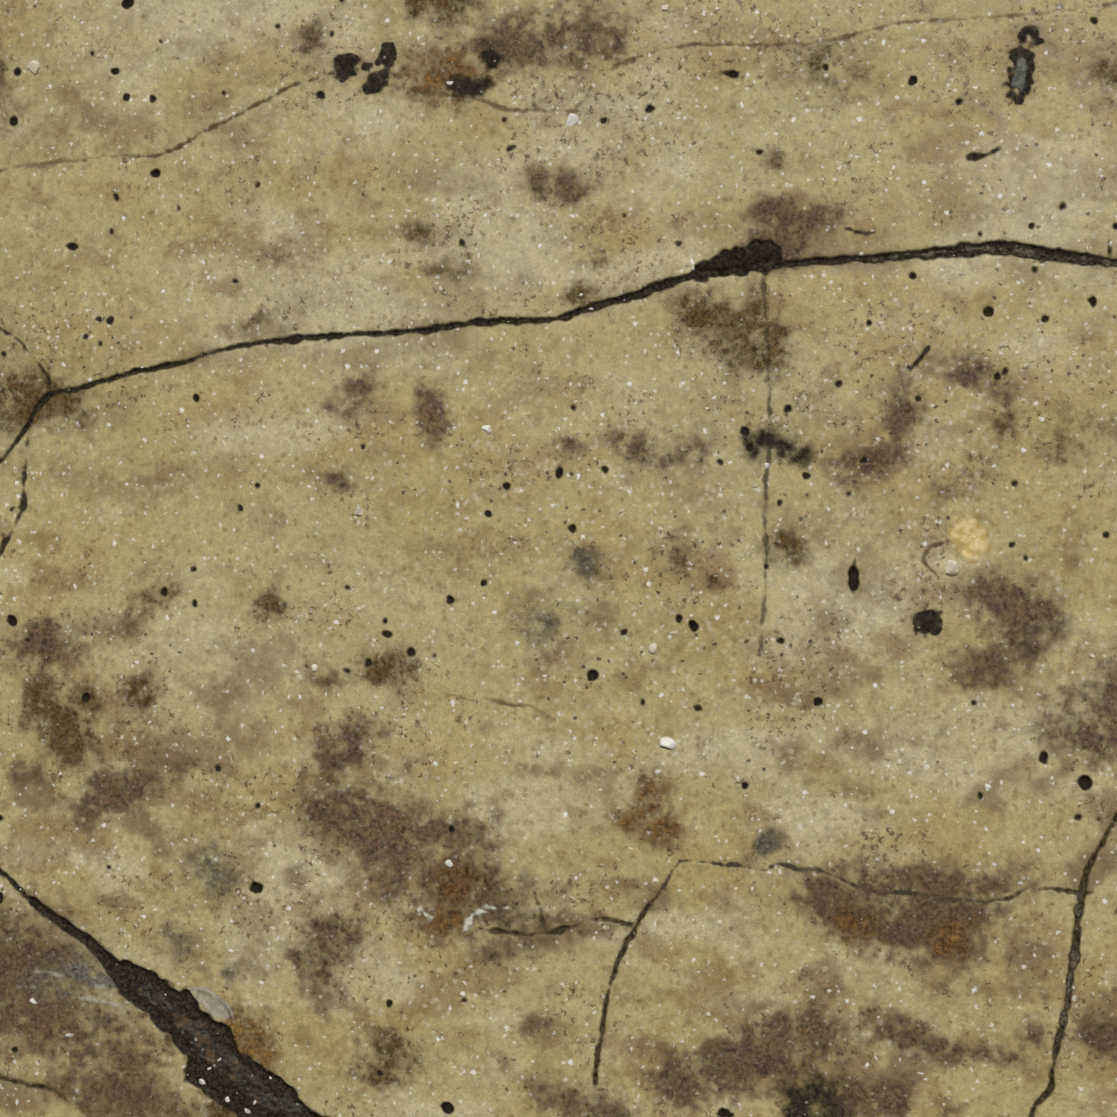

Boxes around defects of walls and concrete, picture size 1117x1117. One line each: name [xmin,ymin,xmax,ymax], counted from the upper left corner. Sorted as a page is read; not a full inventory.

water stain [406,0,472,25]
crack [136,72,334,157]
crack [0,239,1117,555]
crack [769,863,858,887]
crack [889,888,918,896]
water stain [0,915,191,1117]
crack [0,869,327,1117]
spalling [190,988,232,1018]
crack [479,860,742,1085]
crack [949,813,1117,1117]
mould [782,1078,852,1117]